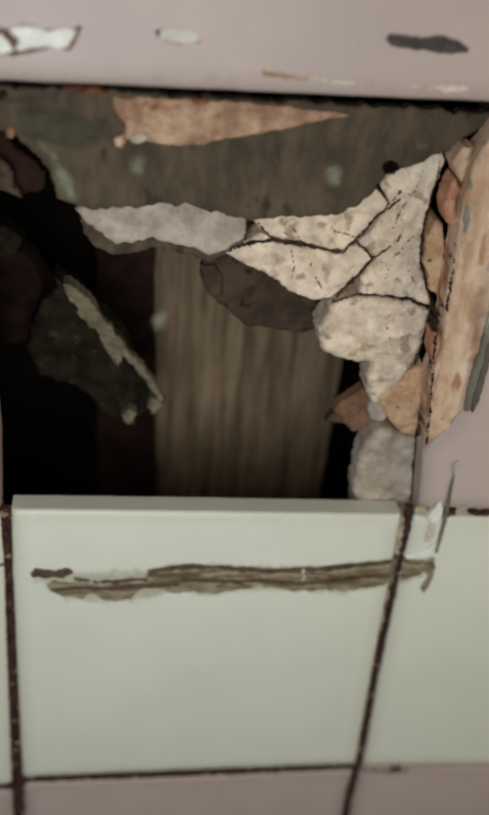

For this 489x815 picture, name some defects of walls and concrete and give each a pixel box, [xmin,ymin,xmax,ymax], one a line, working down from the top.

spalling [0,25,81,56]
spalling [1,80,478,110]
flaking render [0,117,489,506]
crack [225,162,457,502]